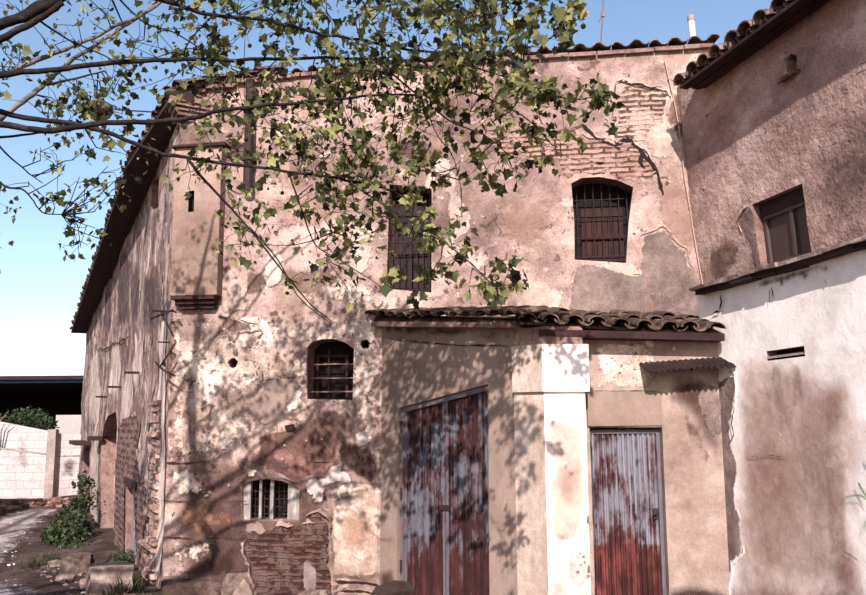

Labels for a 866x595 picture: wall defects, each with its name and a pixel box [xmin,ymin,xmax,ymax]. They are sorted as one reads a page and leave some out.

peeling [485,78,674,186]
crack [557,104,664,195]
peeling [218,316,260,359]
peeling [246,378,298,431]
water stain [676,382,709,435]
peeling [718,371,738,427]
peeling [114,411,149,573]
water stain [169,412,376,594]
water stain [740,367,857,595]
peeling [240,507,338,595]